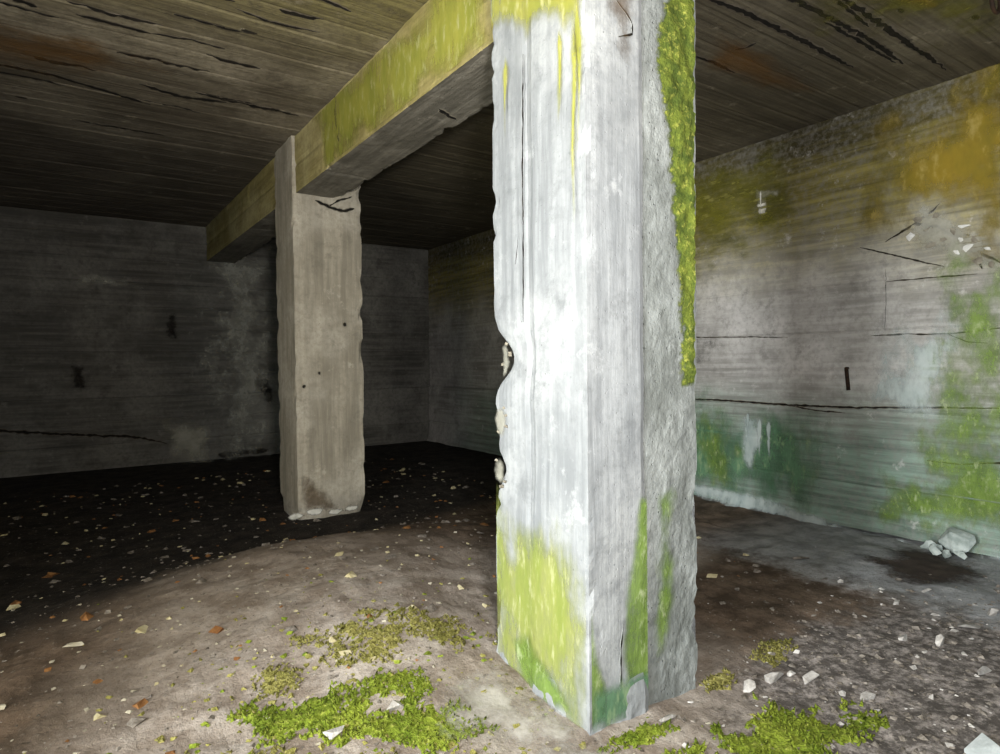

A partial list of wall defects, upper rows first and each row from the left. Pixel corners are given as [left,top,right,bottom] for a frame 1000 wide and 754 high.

water stain [876,340,953,410]
spalling [496,406,508,434]
water stain [744,414,770,465]